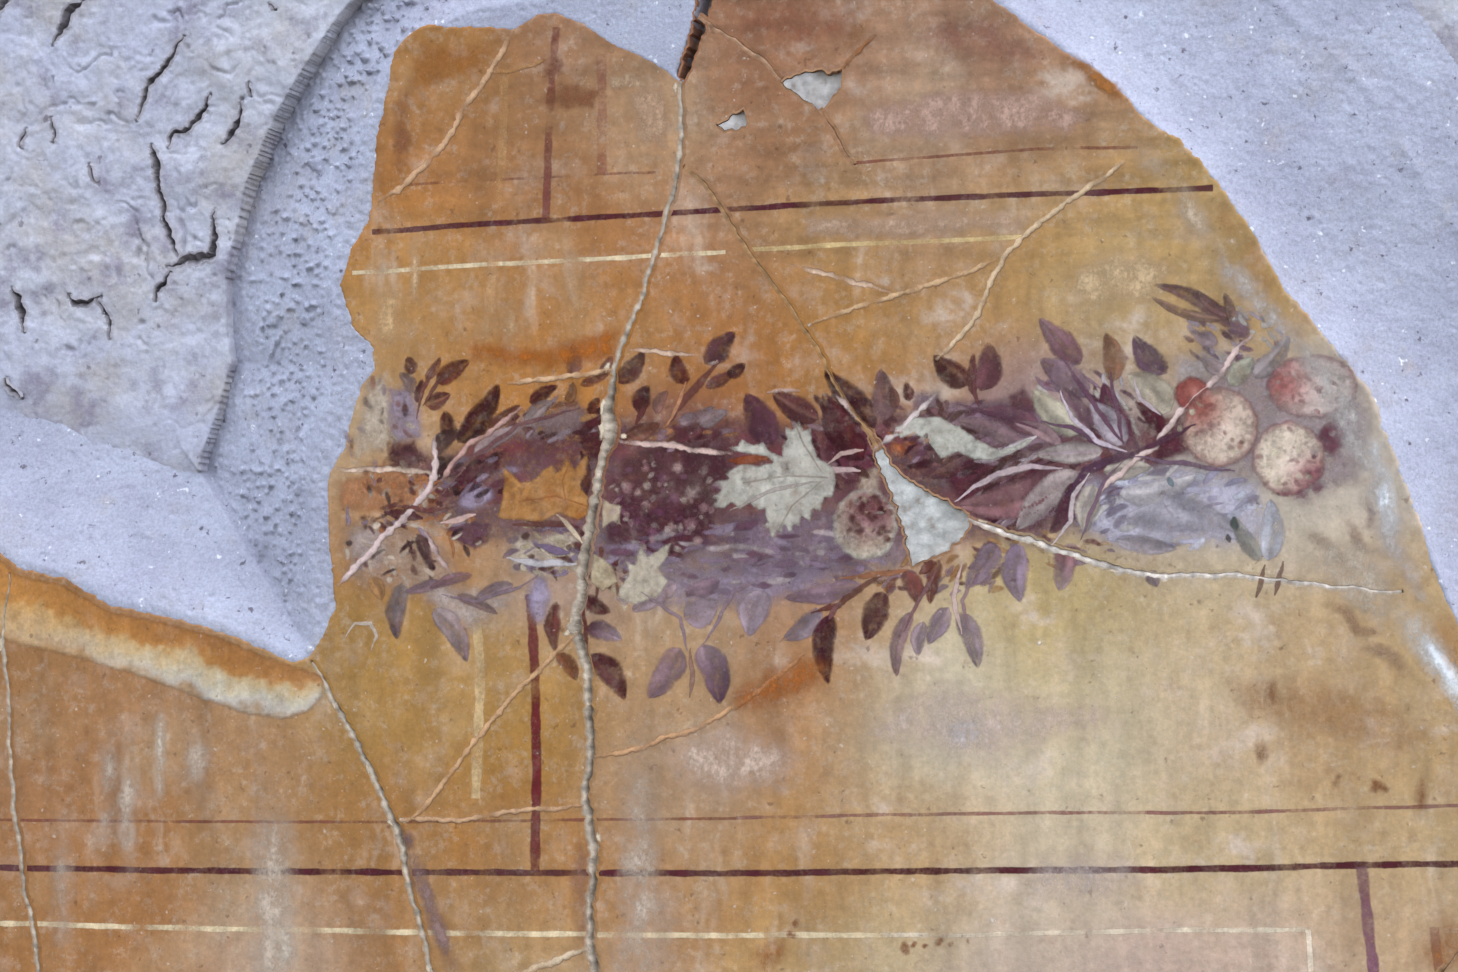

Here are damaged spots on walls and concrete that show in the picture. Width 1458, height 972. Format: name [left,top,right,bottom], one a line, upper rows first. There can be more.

spalling [50,0,94,45]
spalling [134,35,187,122]
crack [697,12,783,82]
flaking render [781,67,844,112]
crack [842,39,871,68]
spalling [148,93,222,302]
crack [1101,338,1250,492]
crack [310,81,1121,972]
flaking render [867,429,972,569]
crack [967,515,1402,596]
flaking render [0,561,323,718]
crack [0,573,44,972]